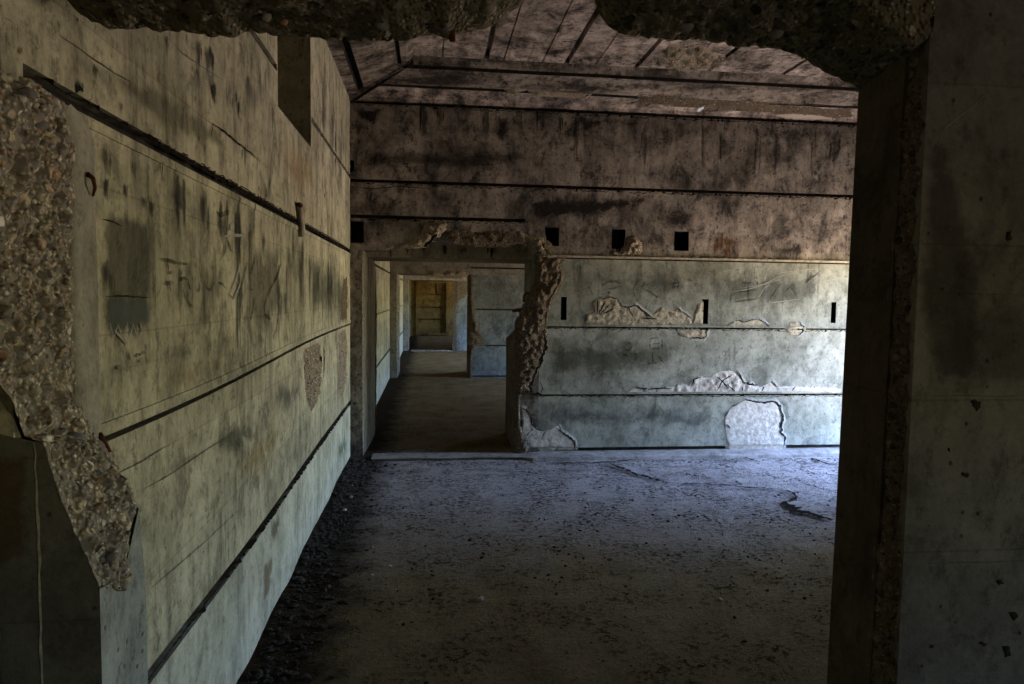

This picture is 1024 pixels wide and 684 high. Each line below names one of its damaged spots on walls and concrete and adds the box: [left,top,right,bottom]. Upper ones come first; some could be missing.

spalling [611,229,643,256]
spalling [0,69,138,592]
spalling [394,222,578,454]
flaking render [585,294,710,341]
flaking render [628,370,841,449]
crack [540,457,832,520]